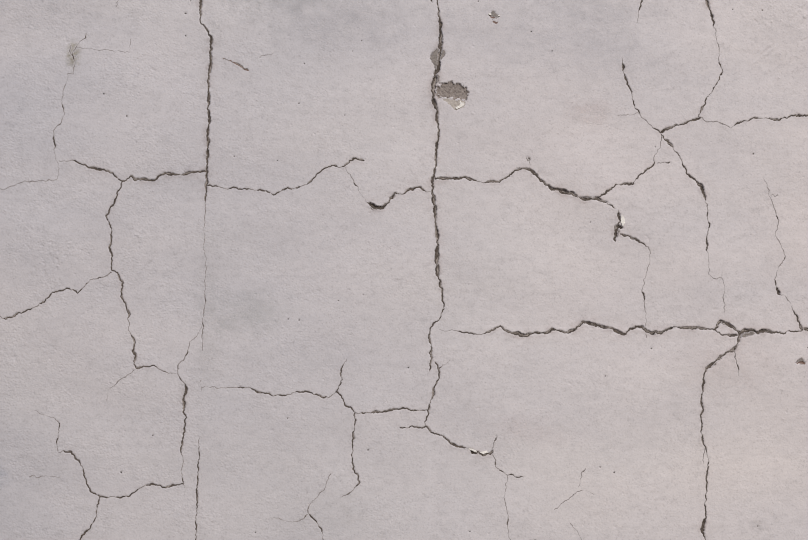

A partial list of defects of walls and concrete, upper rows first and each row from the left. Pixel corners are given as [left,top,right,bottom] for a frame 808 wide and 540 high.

crack [0,0,365,540]
spalling [436,82,469,110]
crack [200,0,808,540]